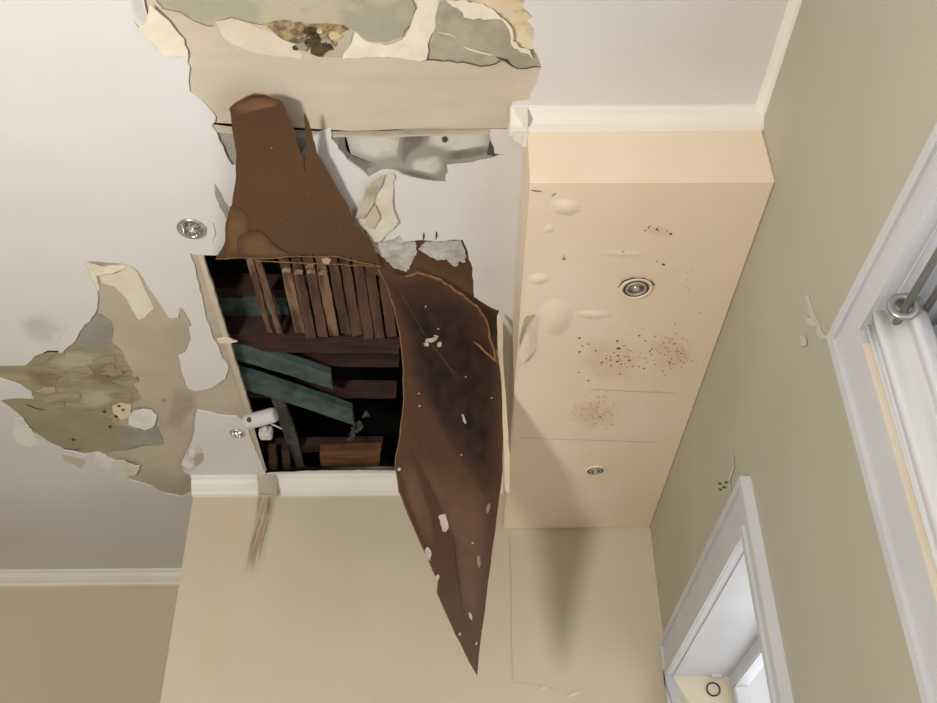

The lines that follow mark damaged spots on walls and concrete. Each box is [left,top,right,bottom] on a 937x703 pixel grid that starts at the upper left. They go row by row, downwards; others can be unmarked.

peeling [139,0,541,165]
flaking render [0,254,253,495]
water stain [575,324,697,384]
water stain [214,473,278,580]
peeling [438,514,449,532]